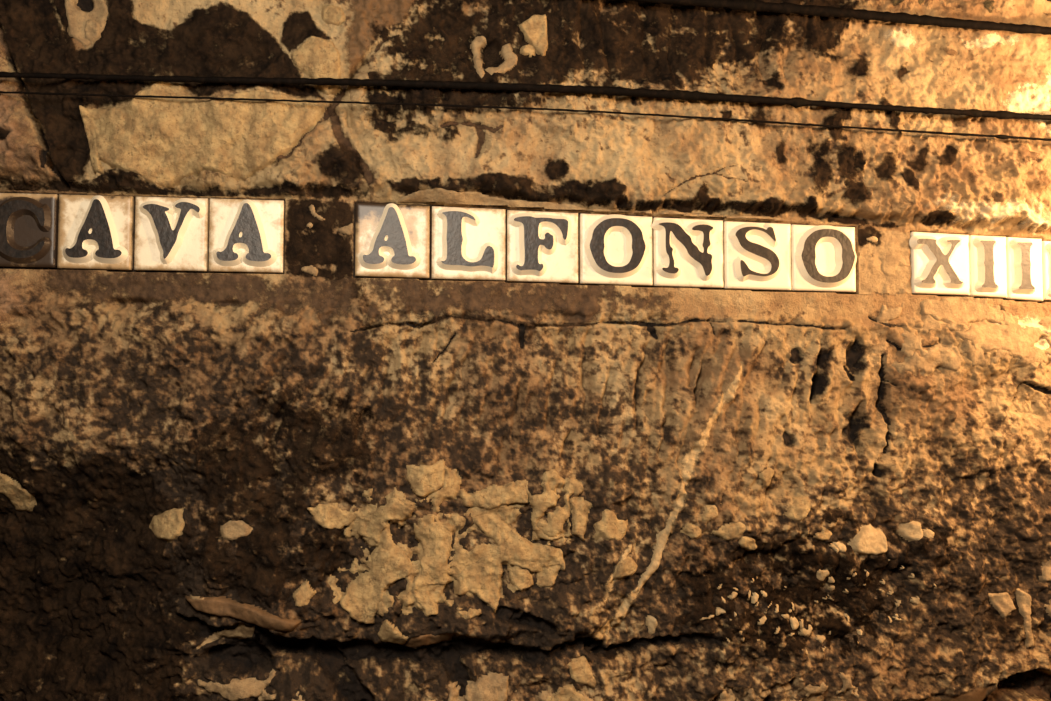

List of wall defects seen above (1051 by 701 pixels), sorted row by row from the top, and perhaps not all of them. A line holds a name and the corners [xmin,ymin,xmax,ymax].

crack [180,607,723,701]